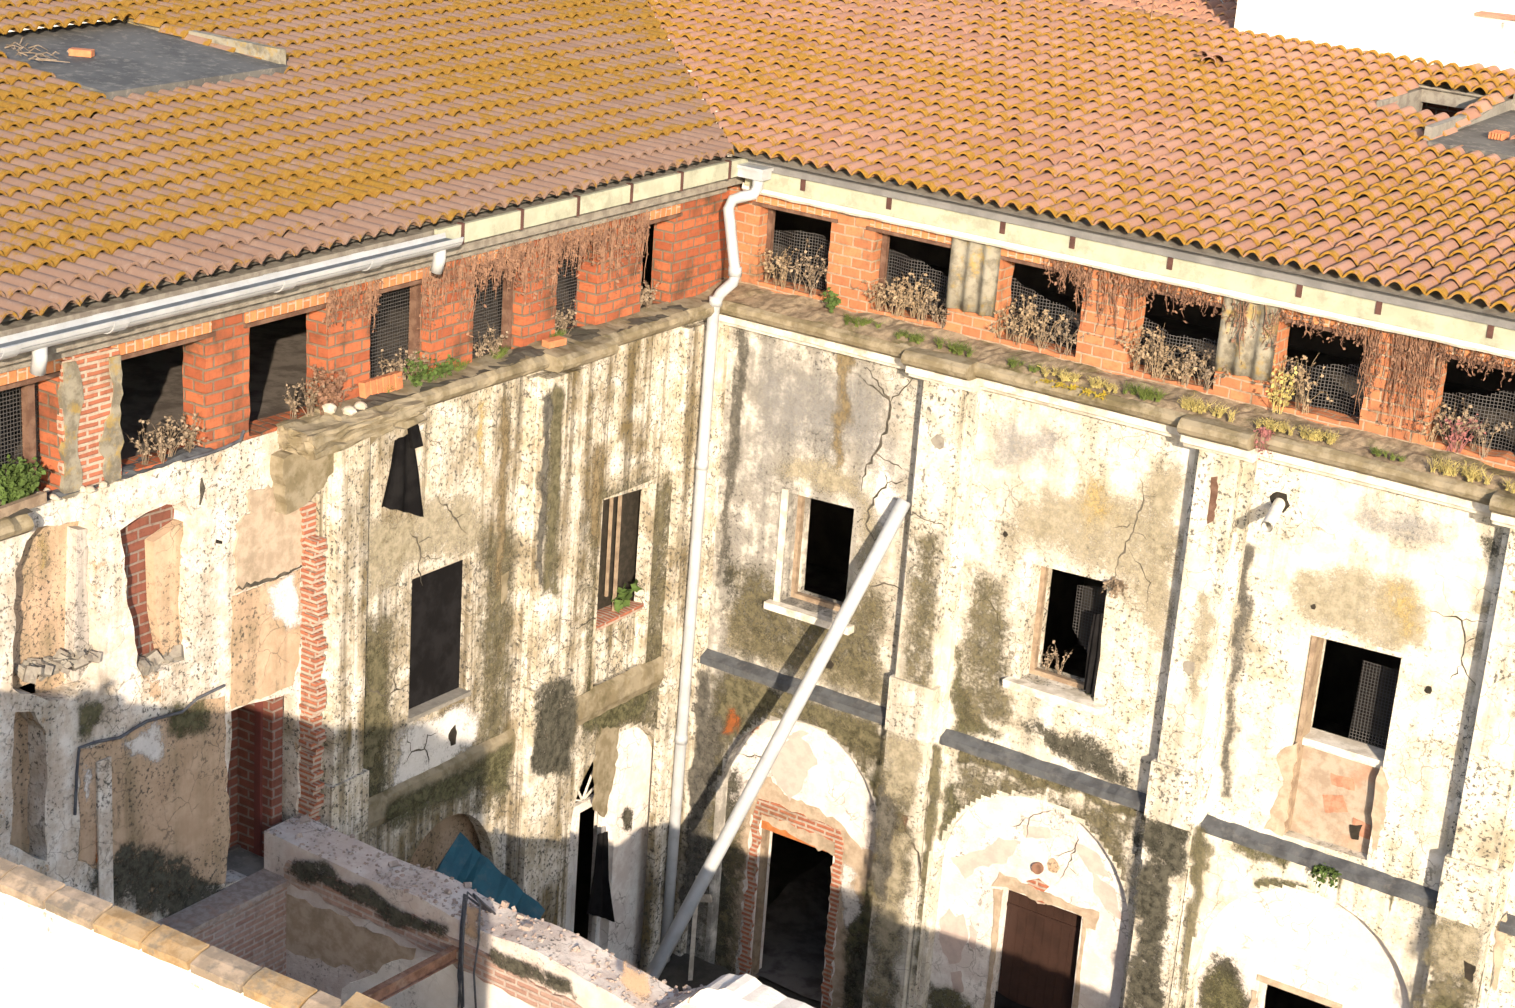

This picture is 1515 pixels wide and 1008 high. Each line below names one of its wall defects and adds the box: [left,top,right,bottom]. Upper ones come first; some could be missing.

flaking render [215,450,334,656]
leakage [364,495,514,794]
leakage [717,328,900,699]
crack [854,367,944,599]
leakage [904,535,940,688]
crack [1115,479,1176,600]
peeling [715,730,876,1008]
peeling [951,824,1053,879]
flaking render [1026,878,1050,905]
peeling [1071,841,1123,920]
leakage [952,571,1251,1008]
leakage [1413,918,1479,1008]